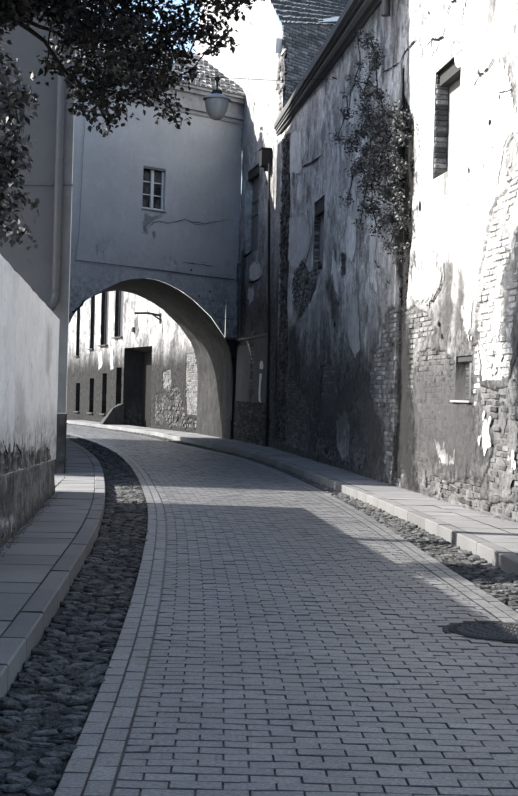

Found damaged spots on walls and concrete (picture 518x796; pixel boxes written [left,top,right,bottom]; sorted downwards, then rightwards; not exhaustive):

crack [384,0,456,86]
crack [468,59,494,104]
crack [142,219,236,233]
spalling [254,45,321,445]
flaking render [331,208,357,301]
flaking render [347,285,360,357]
leakage [390,94,479,492]
spalling [370,29,518,523]